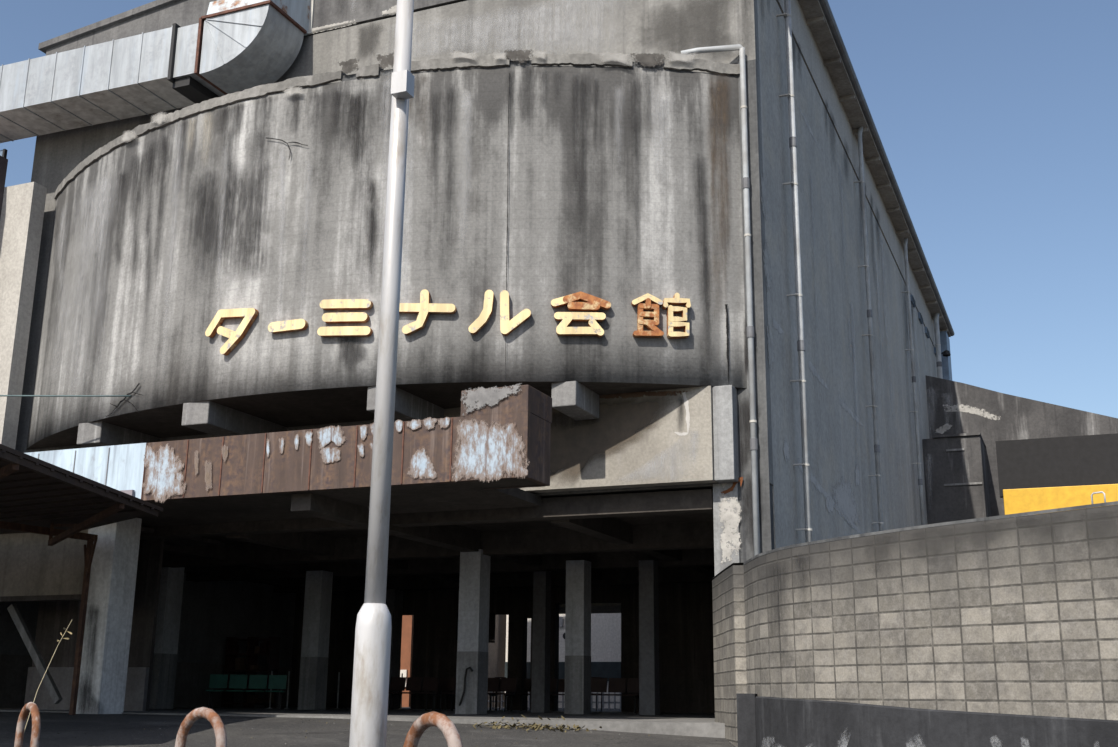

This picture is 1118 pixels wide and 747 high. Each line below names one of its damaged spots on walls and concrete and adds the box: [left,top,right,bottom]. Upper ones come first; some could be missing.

spalling [602,52,692,68]
water stain [222,103,243,125]
crack [266,137,308,158]
water stain [334,91,367,155]
water stain [744,334,755,369]
crack [106,383,141,417]
peeling [266,423,374,464]
peeling [395,383,529,482]
water stain [740,404,750,463]
peeling [142,443,228,503]
peeling [718,483,742,563]
water stain [745,483,760,541]